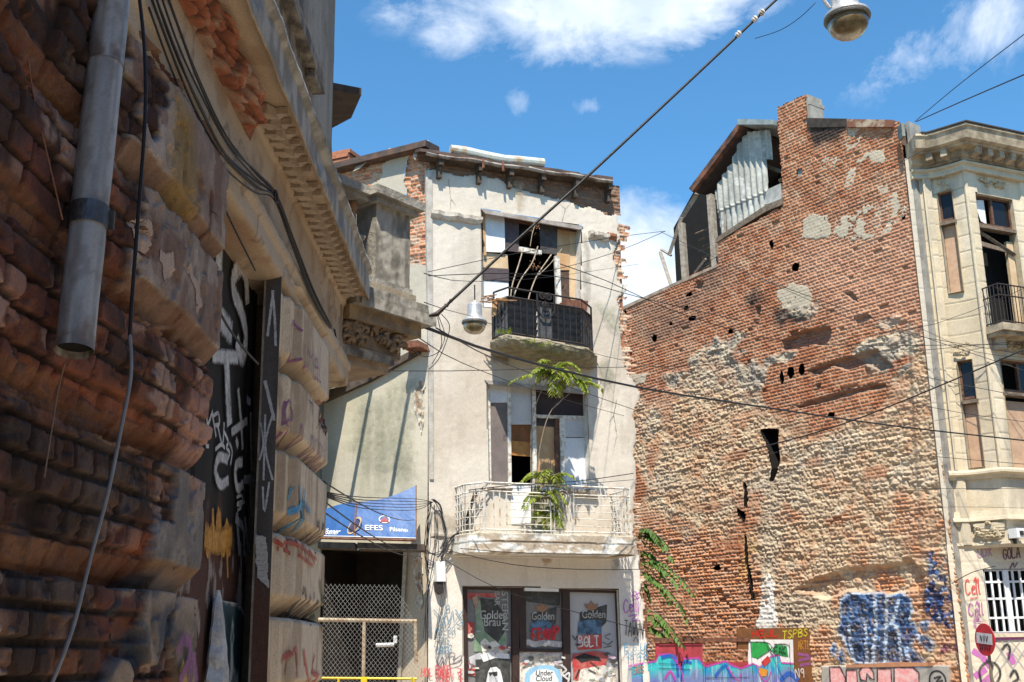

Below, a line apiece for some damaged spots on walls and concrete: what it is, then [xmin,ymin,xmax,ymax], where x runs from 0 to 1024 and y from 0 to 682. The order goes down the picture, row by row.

peeling [126,219,203,315]
spalling [403,153,637,382]
spalling [684,279,704,321]
spalling [780,325,832,351]
spalling [854,312,873,325]
spalling [780,347,895,417]
spalling [632,495,642,550]